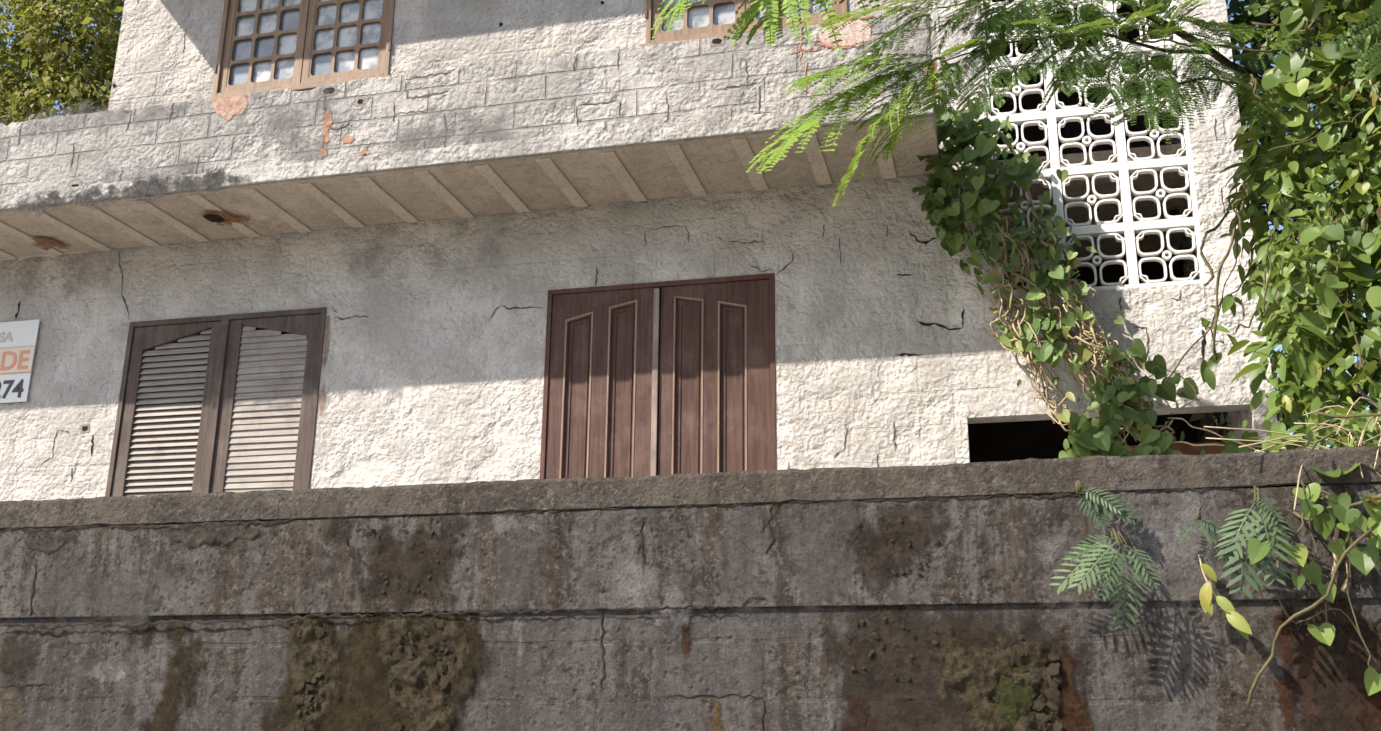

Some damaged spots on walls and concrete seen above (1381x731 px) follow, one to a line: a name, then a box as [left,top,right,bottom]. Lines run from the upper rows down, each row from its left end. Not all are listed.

spalling [212,94,248,121]
spalling [319,85,369,157]
water stain [0,162,251,217]
crack [489,305,543,321]
crack [896,307,965,356]
water stain [285,614,342,731]
water stain [376,612,475,731]
corrosion [1056,634,1092,731]
corrosion [1268,599,1381,731]